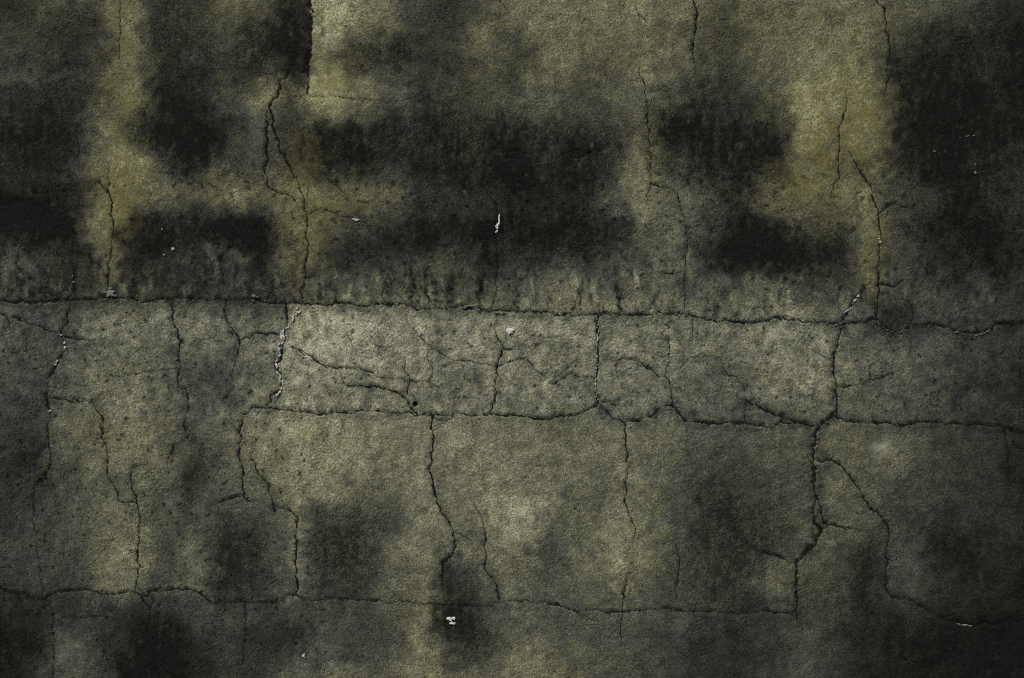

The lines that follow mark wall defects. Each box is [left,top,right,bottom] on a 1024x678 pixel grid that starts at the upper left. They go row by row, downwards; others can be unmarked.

leakage [0,102,76,250]
leakage [104,0,233,185]
leakage [97,164,273,266]
crack [0,59,438,528]
leakage [293,110,628,306]
crack [638,69,687,232]
leakage [658,84,782,211]
leakage [709,215,852,272]
crack [830,91,847,197]
crack [0,150,1024,678]